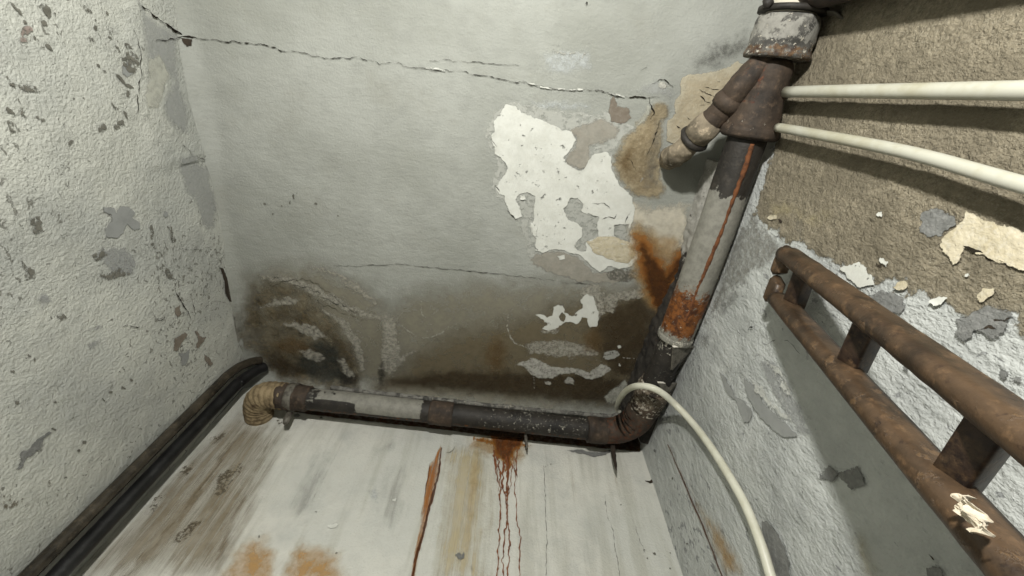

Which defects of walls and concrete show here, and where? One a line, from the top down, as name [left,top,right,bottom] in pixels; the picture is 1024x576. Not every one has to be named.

crack [137,3,655,119]
peeling [485,96,640,283]
flaking render [648,61,743,144]
spalling [752,0,1024,342]
rust [632,227,681,308]
water stain [238,269,657,410]
rust [294,410,640,576]